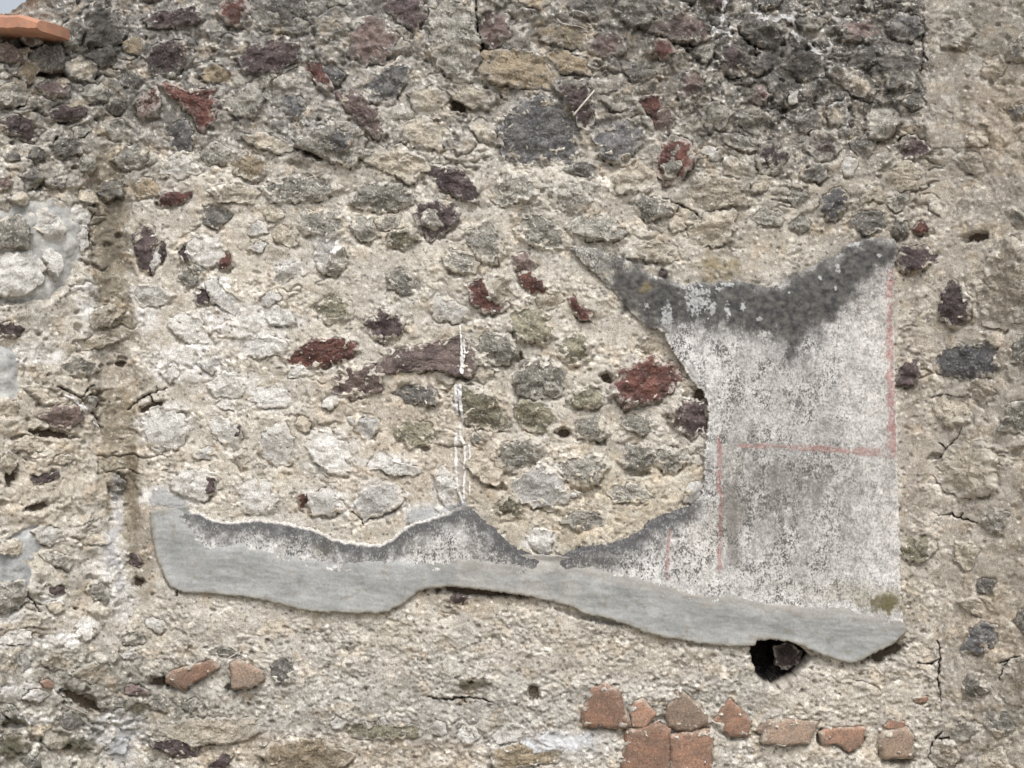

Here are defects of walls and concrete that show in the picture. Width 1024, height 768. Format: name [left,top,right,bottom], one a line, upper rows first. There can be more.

damp [613,238,896,359]
peeling [149,237,908,664]
crack [428,695,492,703]
crack [917,640,942,698]